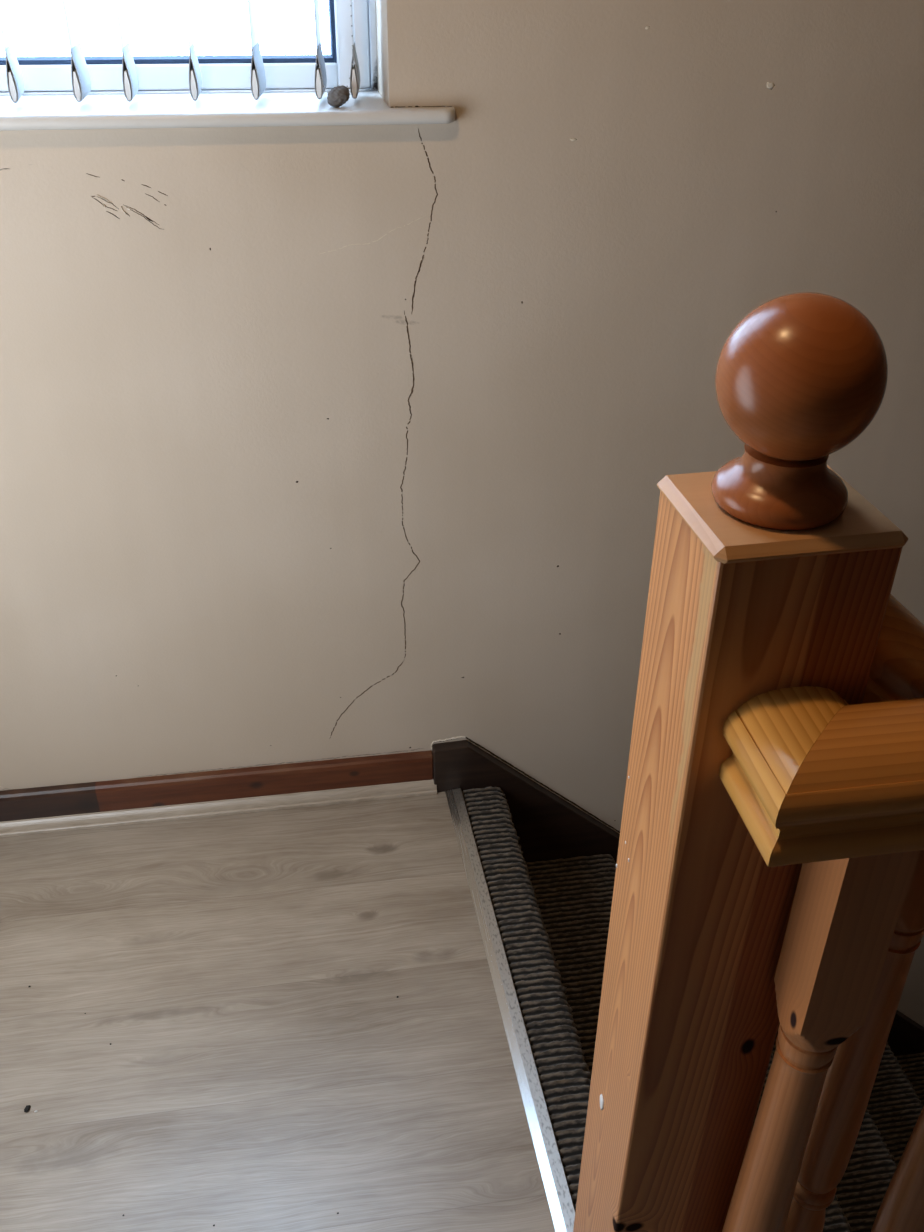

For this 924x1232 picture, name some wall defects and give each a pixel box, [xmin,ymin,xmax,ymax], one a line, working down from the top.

crack [330,106,452,738]